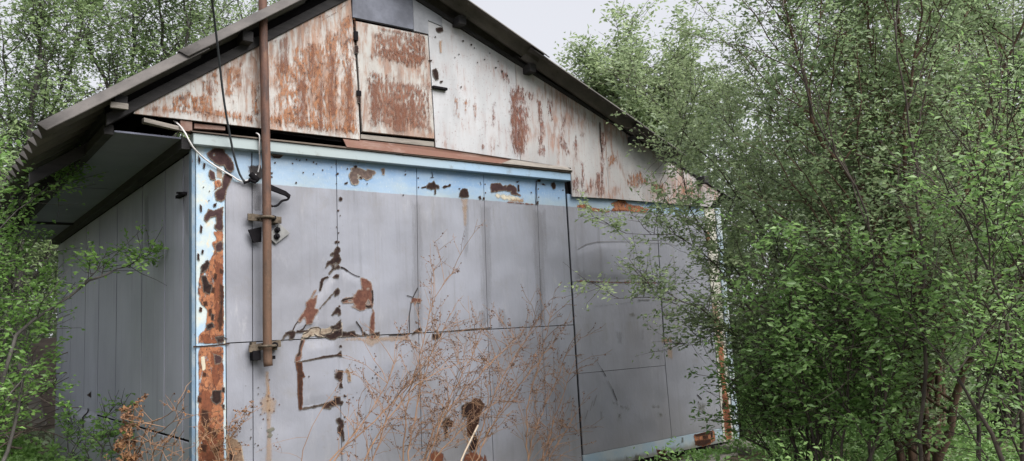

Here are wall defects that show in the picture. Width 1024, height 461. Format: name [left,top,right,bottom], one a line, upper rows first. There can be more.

rust [133,0,649,213]
peeling [421,173,564,204]
rust [198,231,280,461]
peeling [282,215,492,410]
rust [463,432,487,461]